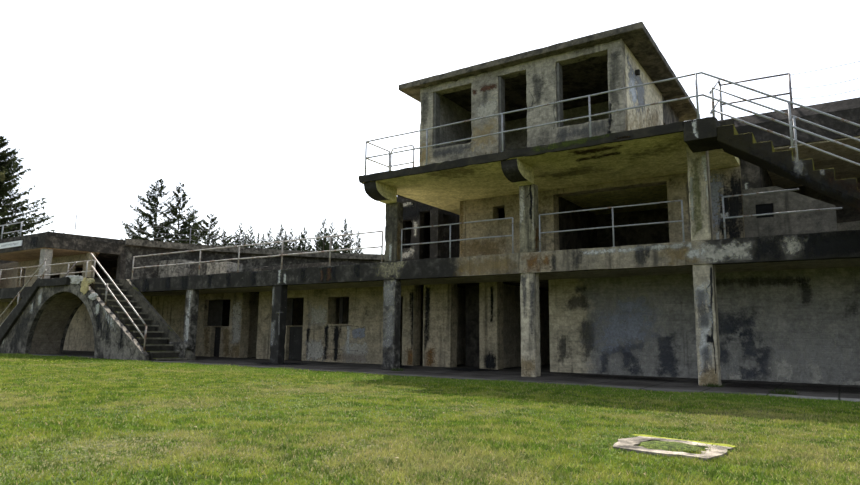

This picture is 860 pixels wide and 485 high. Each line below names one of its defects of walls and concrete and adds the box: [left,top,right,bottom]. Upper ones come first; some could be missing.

damp [716,277,811,303]
damp [322,325,350,361]
damp [557,338,566,360]
damp [580,321,595,354]